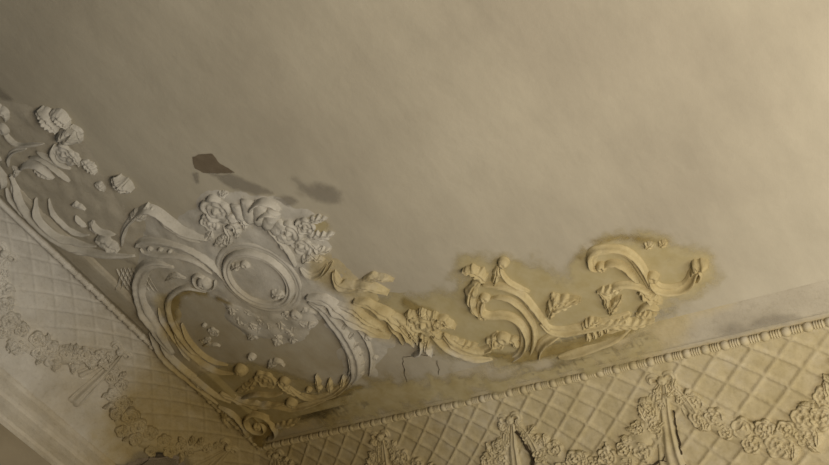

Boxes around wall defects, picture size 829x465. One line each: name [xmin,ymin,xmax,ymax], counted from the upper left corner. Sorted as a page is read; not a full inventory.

peeling [193,154,234,174]
water stain [197,233,715,448]
crack [652,411,686,465]